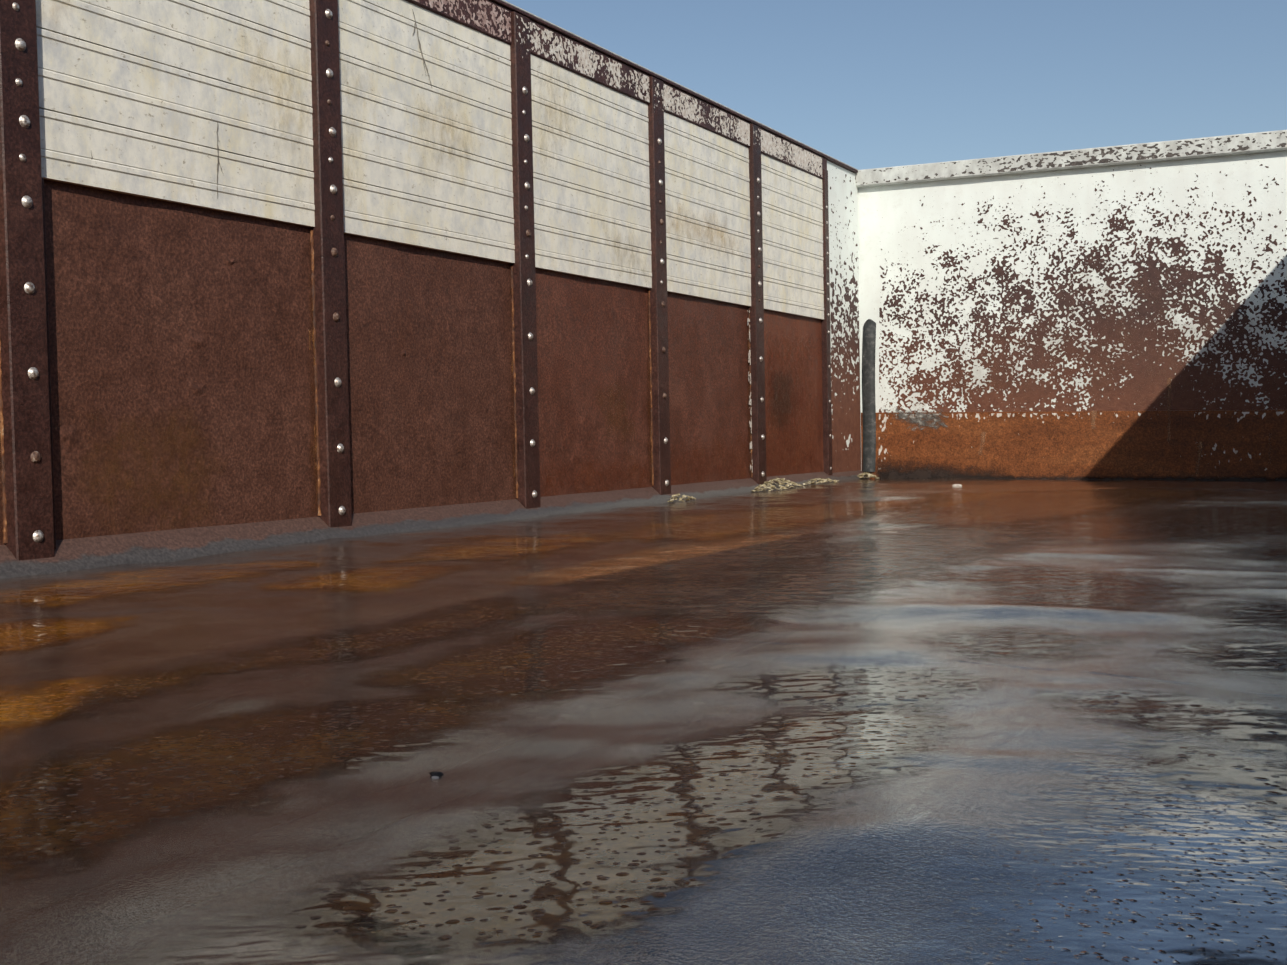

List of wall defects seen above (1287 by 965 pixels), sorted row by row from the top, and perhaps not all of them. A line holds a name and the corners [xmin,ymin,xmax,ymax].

peeling [415,0,1287,473]